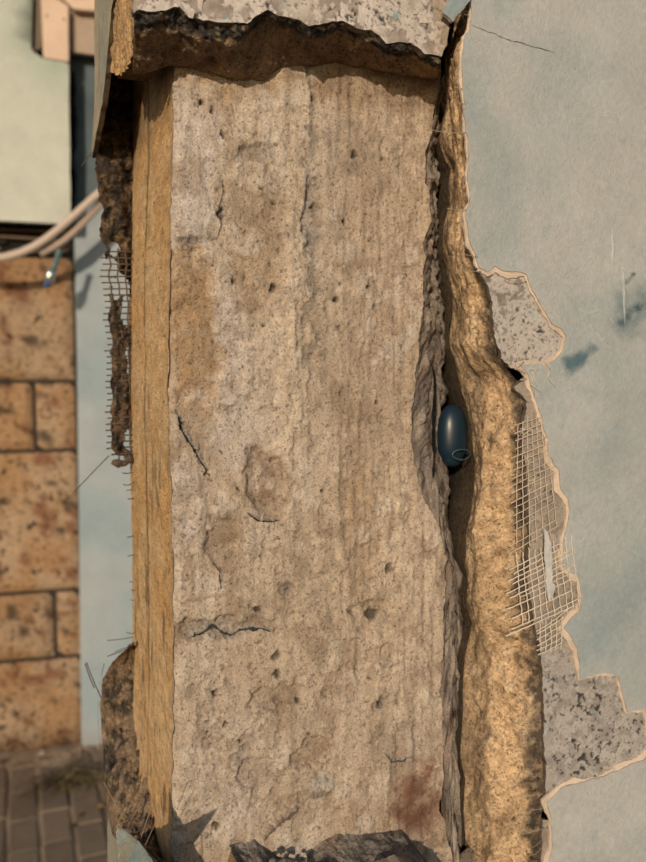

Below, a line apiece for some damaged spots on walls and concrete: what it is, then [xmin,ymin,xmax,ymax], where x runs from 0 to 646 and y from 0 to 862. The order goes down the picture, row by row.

spalling [74,0,470,499]
crack [411,1,552,862]
water stain [565,353,587,369]
crack [211,562,223,589]
crack [191,620,271,637]
spalling [473,266,646,862]
spalling [85,632,163,862]
spalling [228,830,426,862]